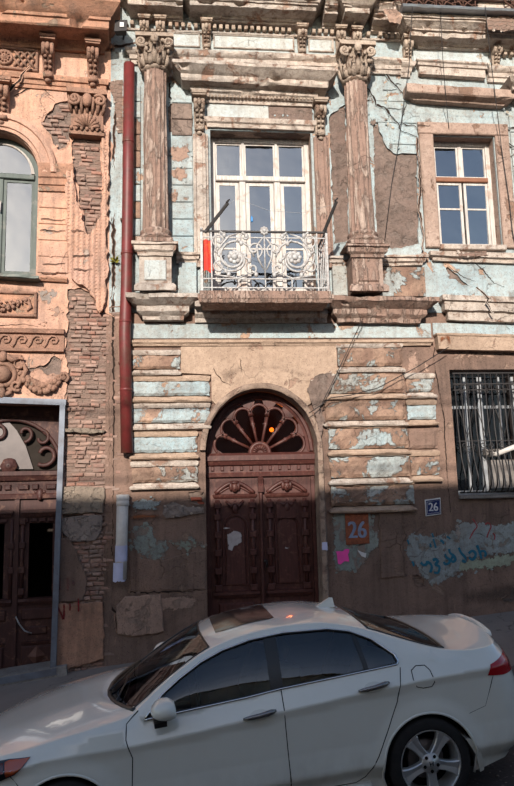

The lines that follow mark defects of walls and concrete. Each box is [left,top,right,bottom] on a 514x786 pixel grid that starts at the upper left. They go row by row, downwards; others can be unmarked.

flaking render [40,99,103,235]
peeling [167,145,193,202]
flaking render [367,96,420,251]
crack [367,74,431,250]
crack [442,262,509,329]
peeling [408,350,430,373]
flaking render [27,287,130,641]
peeling [129,496,166,512]
peeling [128,522,207,560]
peeling [404,519,514,587]